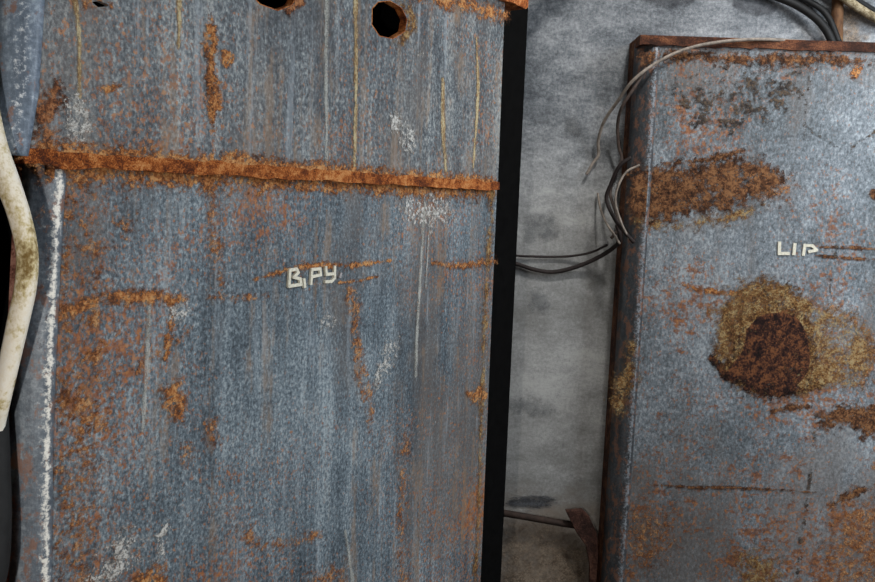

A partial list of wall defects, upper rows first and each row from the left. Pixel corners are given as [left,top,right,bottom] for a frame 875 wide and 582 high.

rust [391,0,510,46]
rust [15,78,497,582]